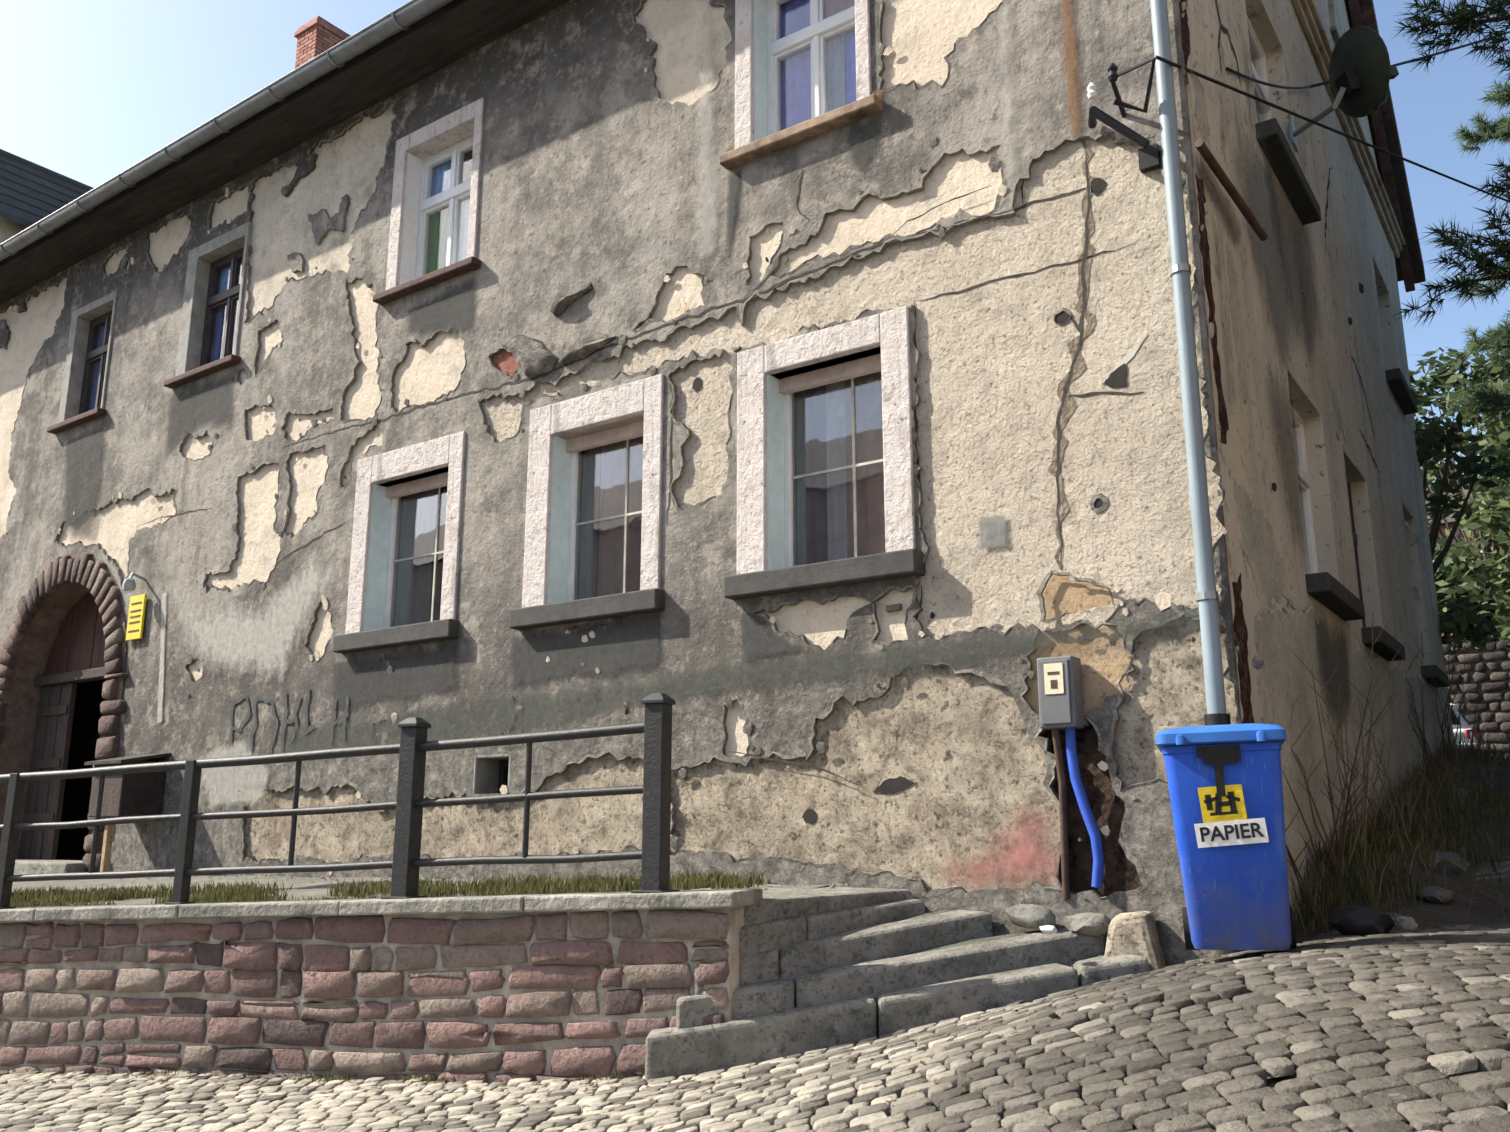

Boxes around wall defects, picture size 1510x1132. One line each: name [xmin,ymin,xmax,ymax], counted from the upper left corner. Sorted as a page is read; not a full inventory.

flaking render [629,0,732,106]
flaking render [875,0,1002,93]
flaking render [0,276,68,538]
flaking render [100,99,467,593]
crack [284,139,1144,569]
flaking render [55,486,178,586]
crack [272,520,349,567]
flaking render [479,132,1264,899]
flaking render [186,655,205,699]
flaking render [304,594,333,661]
flaking render [238,782,397,875]
flaking render [420,749,644,859]